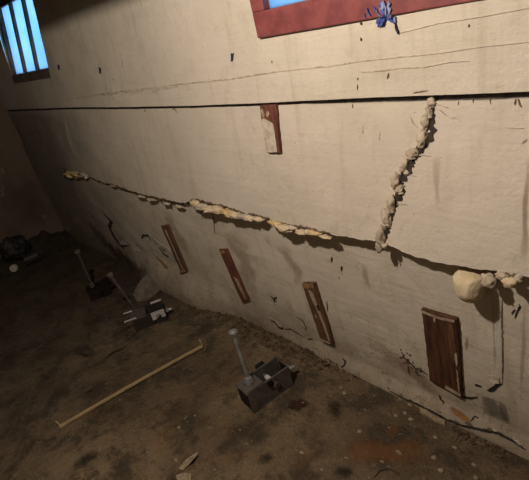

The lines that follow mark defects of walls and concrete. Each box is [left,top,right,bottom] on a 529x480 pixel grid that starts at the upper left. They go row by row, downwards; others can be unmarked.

crack [402,8,527,33]
crack [9,42,529,253]
crack [399,349,428,377]
crack [387,384,526,451]